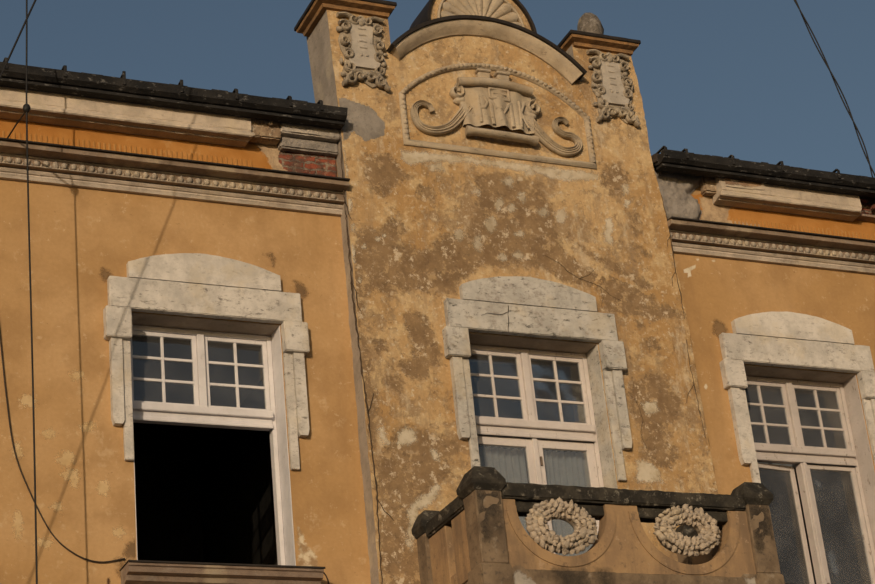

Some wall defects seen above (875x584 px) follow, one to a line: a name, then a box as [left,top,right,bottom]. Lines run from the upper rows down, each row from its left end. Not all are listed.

crack [661,195,685,319]
peeling [681,256,718,280]
flaking render [855,196,875,222]
crack [340,137,394,582]
peeling [249,143,689,584]
crack [686,340,706,438]